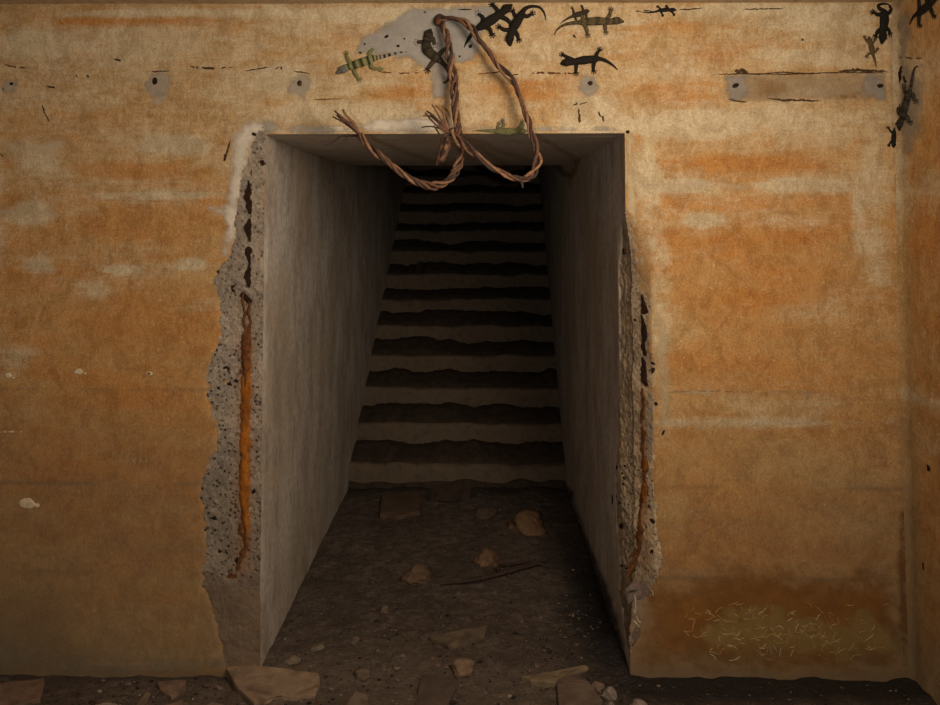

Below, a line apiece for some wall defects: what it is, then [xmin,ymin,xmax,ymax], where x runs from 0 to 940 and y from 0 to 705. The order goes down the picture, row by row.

leakage [209,121,276,254]
leakage [295,118,453,132]
leakage [526,102,587,131]
spalling [199,130,266,668]
spalling [611,209,665,656]